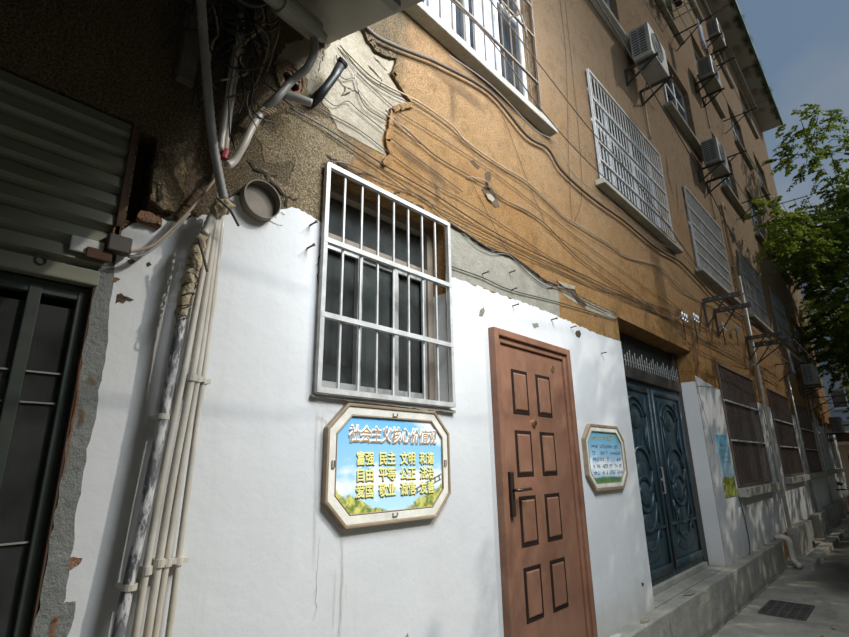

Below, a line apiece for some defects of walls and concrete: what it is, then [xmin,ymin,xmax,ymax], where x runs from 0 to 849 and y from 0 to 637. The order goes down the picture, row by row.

peeling [248,28,413,220]
spalling [112,140,206,235]
peeling [448,221,615,320]
spalling [69,557,83,570]